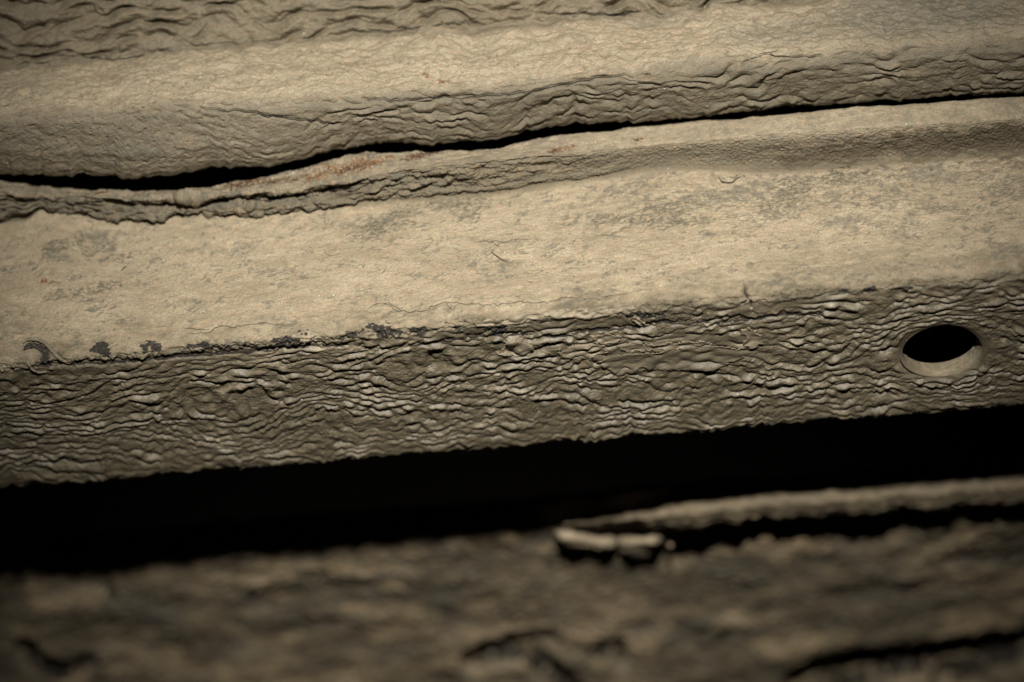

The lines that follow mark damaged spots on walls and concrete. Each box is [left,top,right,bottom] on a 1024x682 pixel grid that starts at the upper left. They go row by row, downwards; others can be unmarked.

crack [0,92,1024,206]
rust [223,152,434,191]
peeling [22,337,70,374]
peeling [89,341,111,357]
peeling [134,340,162,354]
peeling [186,329,316,352]
peeling [339,320,429,340]